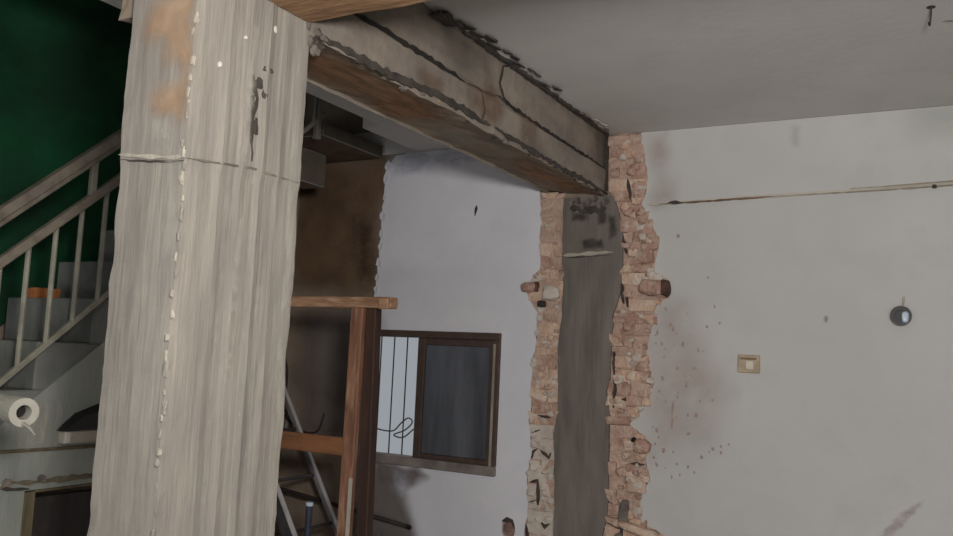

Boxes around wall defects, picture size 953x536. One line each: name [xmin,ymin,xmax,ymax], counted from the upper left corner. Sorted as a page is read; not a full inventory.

crack [354,13,610,191]
spalling [170,134,187,319]
flaking render [306,10,695,536]